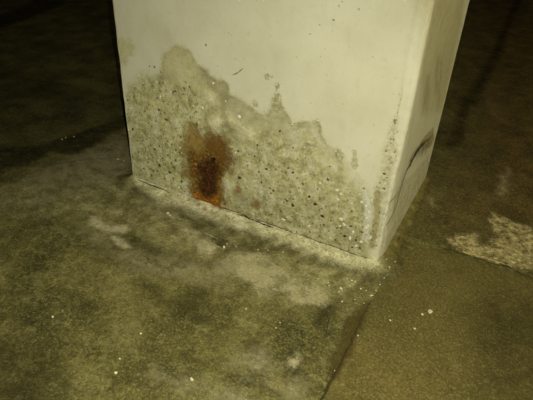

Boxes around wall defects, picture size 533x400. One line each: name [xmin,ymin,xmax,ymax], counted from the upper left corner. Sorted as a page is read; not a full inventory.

spalling [126,74,210,193]
rust [181,125,234,213]
spalling [233,88,428,256]
crack [383,130,434,223]
damp [90,217,129,248]
damp [222,253,329,341]
crack [320,302,371,400]